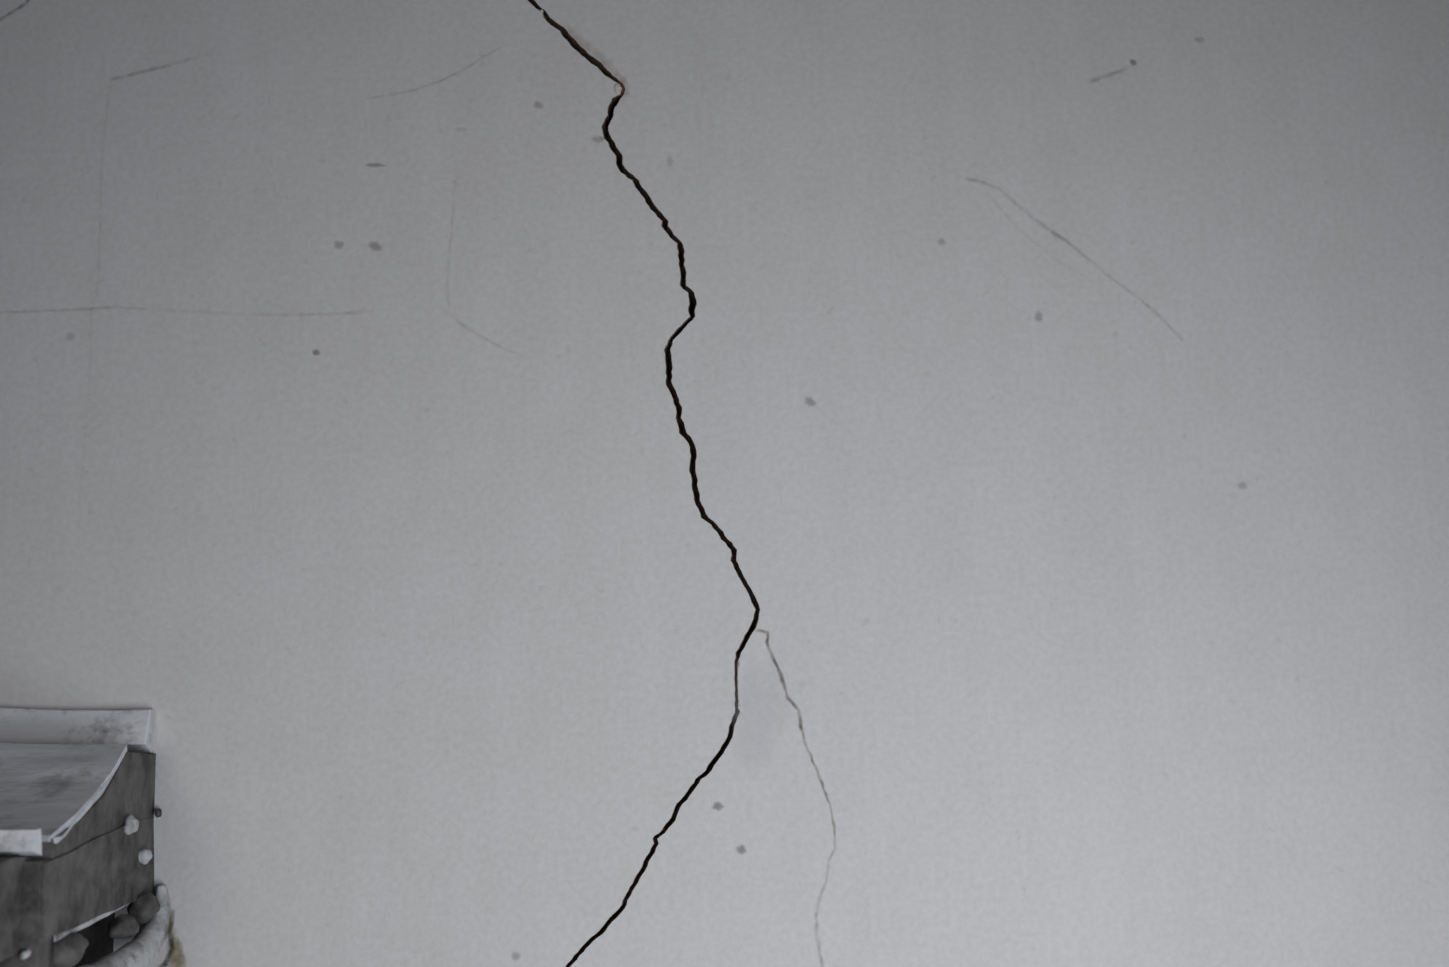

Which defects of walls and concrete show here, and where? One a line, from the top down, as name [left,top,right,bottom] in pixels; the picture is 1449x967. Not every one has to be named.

crack [528,0,802,967]